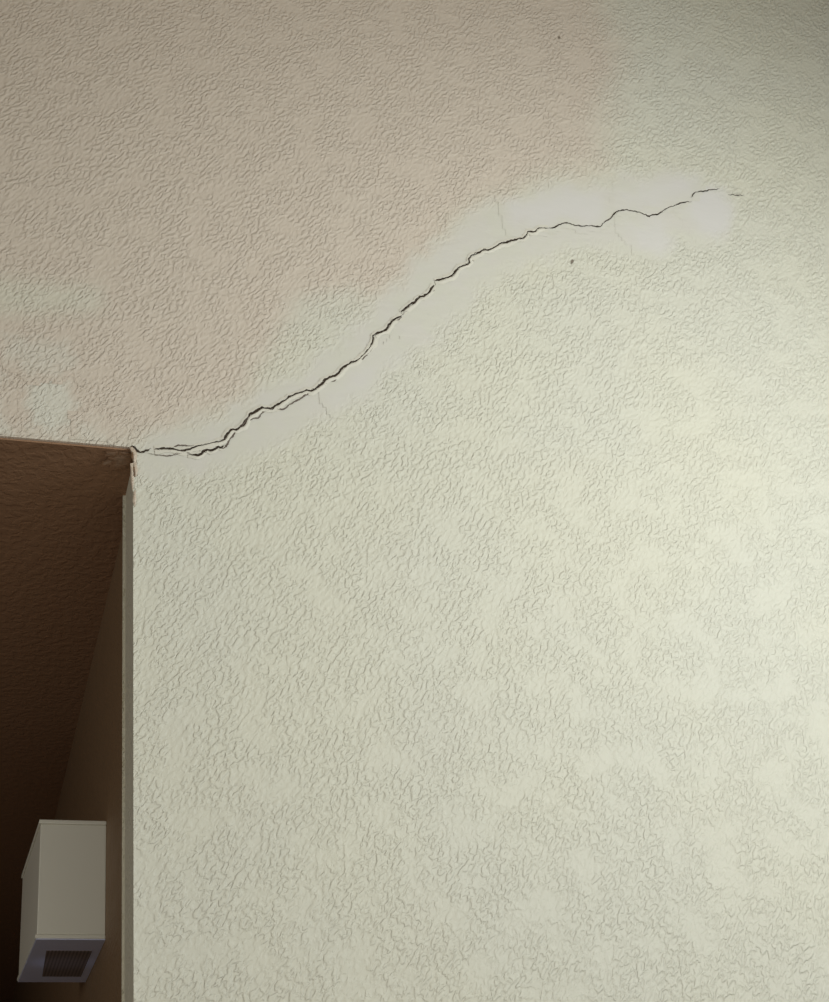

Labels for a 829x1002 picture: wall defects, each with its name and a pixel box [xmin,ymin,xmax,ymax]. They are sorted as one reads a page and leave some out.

crack [131,189,743,459]